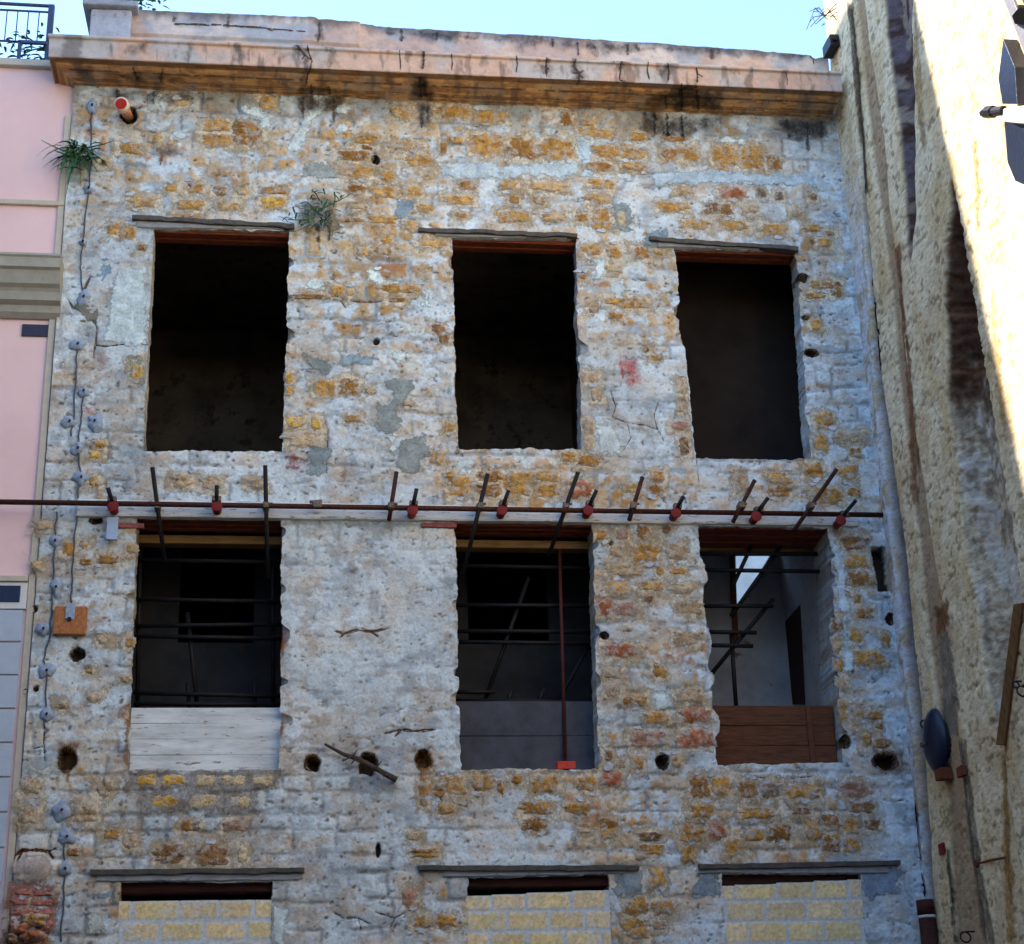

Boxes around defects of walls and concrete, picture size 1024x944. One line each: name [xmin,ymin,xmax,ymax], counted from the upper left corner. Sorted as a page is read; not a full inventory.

damp [297,85,344,122]
damp [414,77,433,128]
damp [646,84,722,138]
damp [779,119,827,151]
peeling [287,95,847,346]
flaking render [275,363,377,453]
flaking render [423,366,624,505]
crack [610,390,664,451]
flaking render [664,374,694,462]
flaking render [727,406,872,509]
flaking render [414,524,901,944]
flaking render [402,827,444,866]